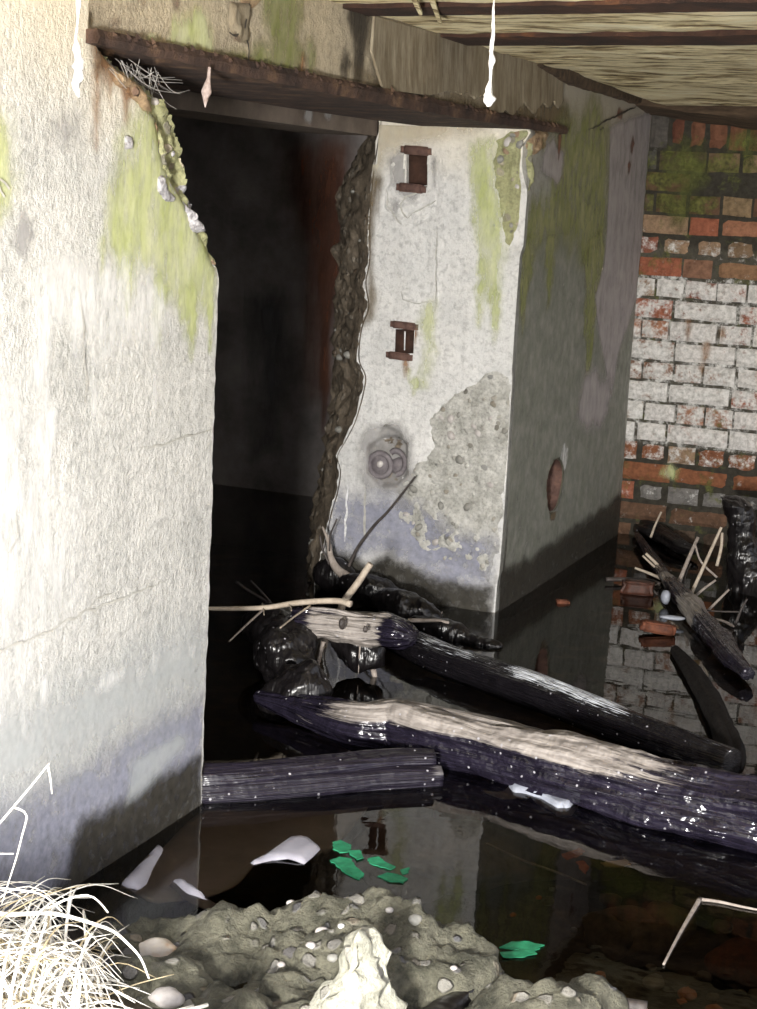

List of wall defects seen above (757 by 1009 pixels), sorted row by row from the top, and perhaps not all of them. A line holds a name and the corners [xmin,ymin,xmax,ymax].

spalling [100,51,216,265]
spalling [306,121,381,584]
flaking render [384,153,438,225]
water stain [477,260,500,329]
water stain [520,235,555,322]
water stain [542,140,563,183]
spalling [380,371,511,582]
water stain [321,425,621,613]